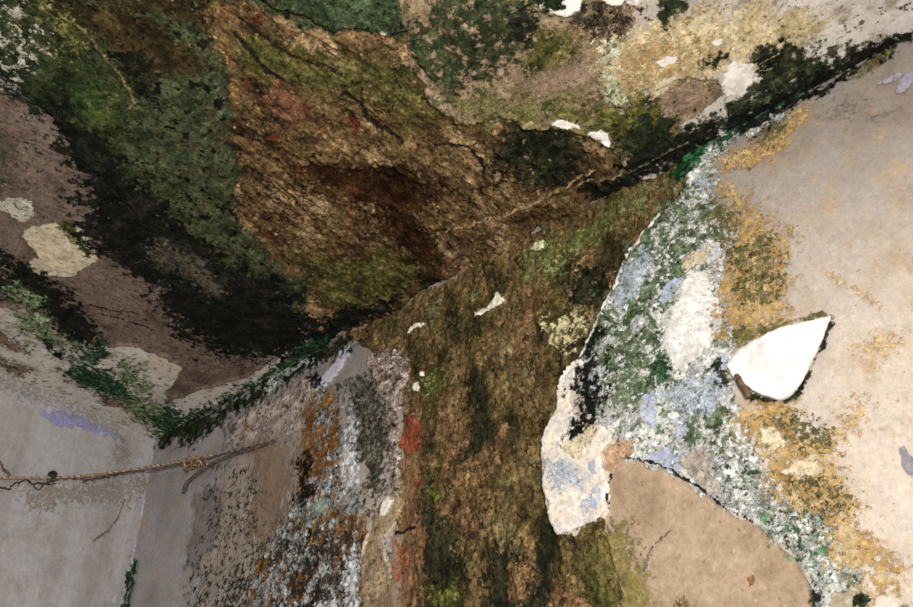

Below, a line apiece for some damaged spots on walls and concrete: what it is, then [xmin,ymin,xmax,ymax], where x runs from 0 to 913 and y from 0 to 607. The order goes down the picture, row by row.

leakage [0,332,148,521]
leakage [0,0,407,376]
leakage [179,345,413,607]
spalling [191,0,812,607]
peeling [726,316,831,401]
spalling [830,590,910,607]